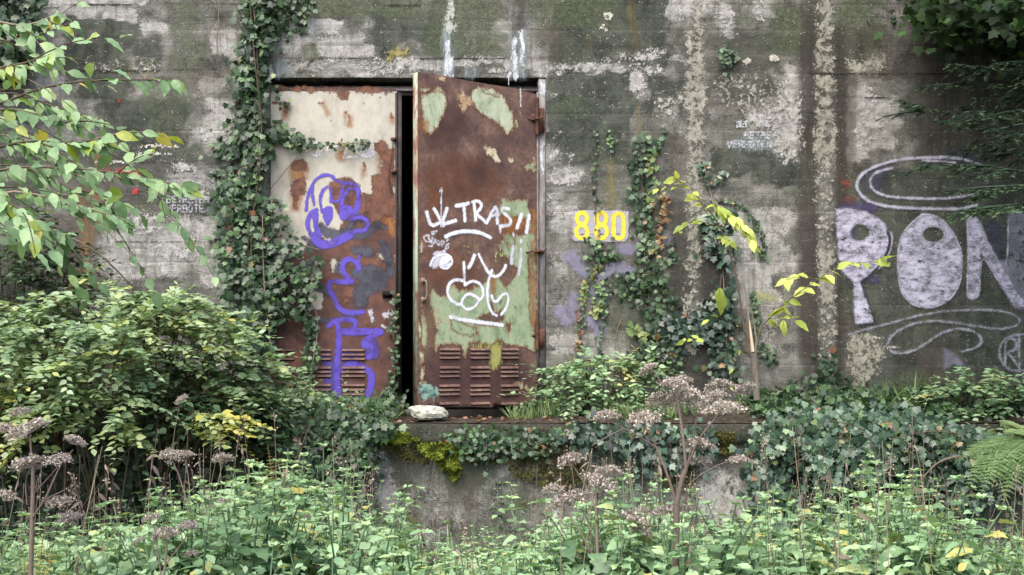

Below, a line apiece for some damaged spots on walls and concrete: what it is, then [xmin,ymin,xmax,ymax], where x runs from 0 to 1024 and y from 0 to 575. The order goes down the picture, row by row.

corrosion [270,85,397,126]
corrosion [423,104,463,150]
efflorescence [442,0,476,77]
efflorescence [507,30,525,107]
corrosion [270,138,399,400]
corrosion [503,210,537,325]
corrosion [422,288,529,402]